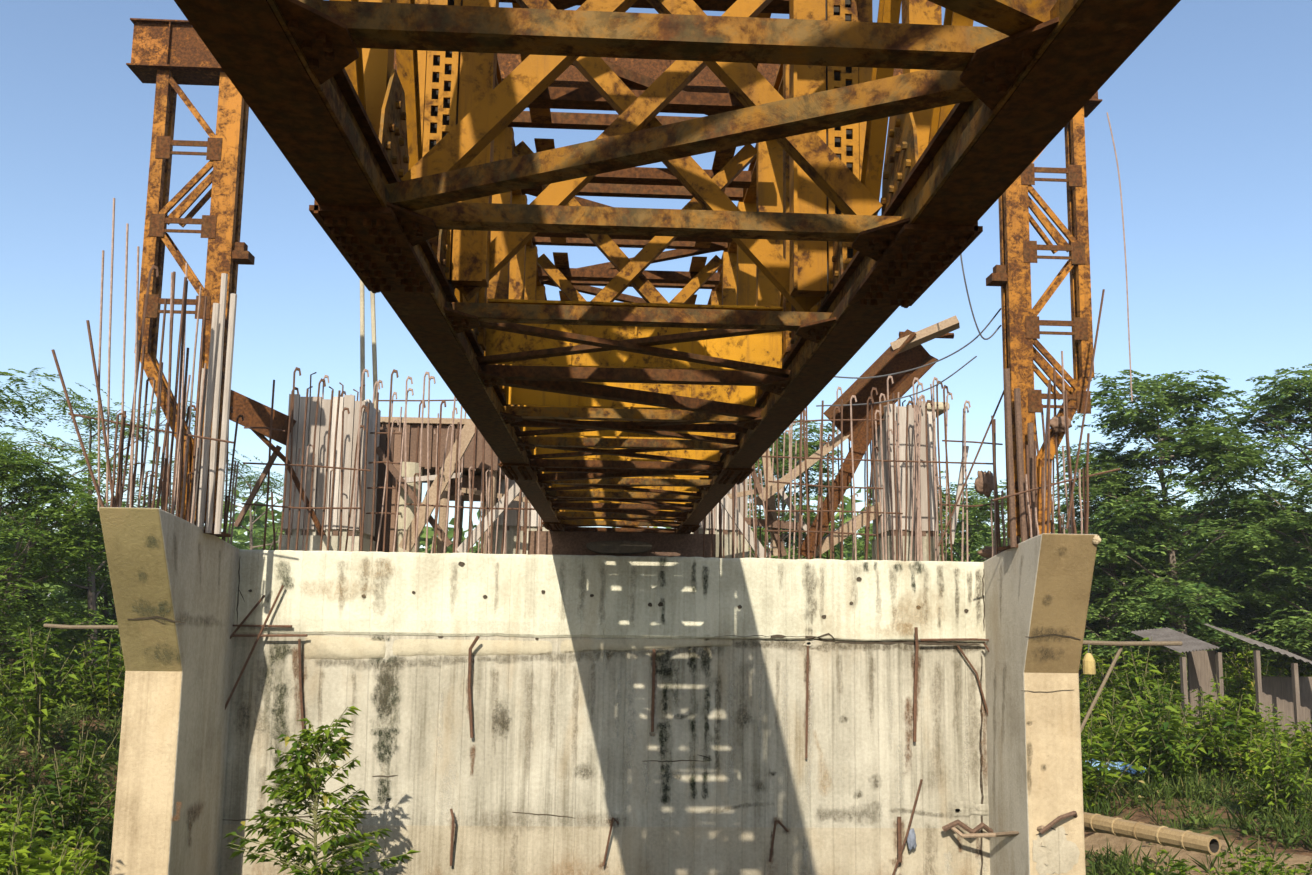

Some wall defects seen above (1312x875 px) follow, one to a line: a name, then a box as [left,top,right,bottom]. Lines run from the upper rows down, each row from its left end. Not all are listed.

leakage [736,566,981,673]
leakage [320,657,431,760]
rust [467,636,480,773]
leakage [582,638,721,802]
rust [600,817,619,867]
rust [769,818,789,862]
rust [892,779,923,875]